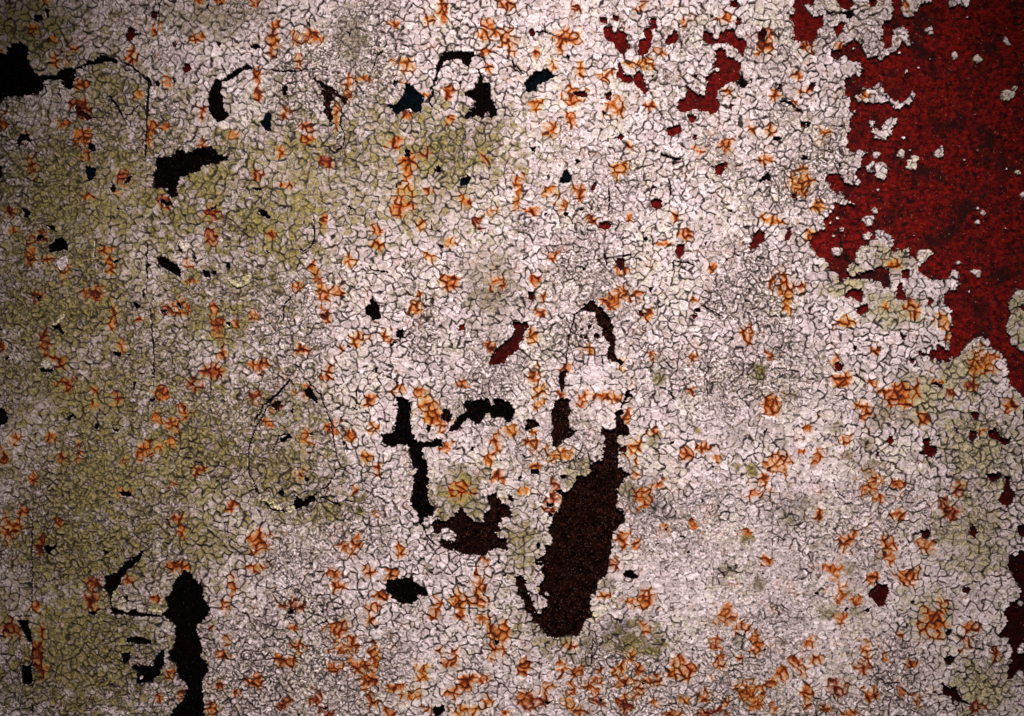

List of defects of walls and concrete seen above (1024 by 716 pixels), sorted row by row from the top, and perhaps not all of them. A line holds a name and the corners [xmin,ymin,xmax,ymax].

crack [110,62,152,156]
peeling [663,1,767,165]
rust [384,136,434,232]
crack [661,154,683,196]
peeling [787,0,1024,397]
crack [148,309,156,385]
rust [853,342,1001,425]
crack [248,379,357,504]
peeling [381,389,634,638]
peeling [105,551,210,716]
rust [427,556,511,662]
rust [321,601,888,716]